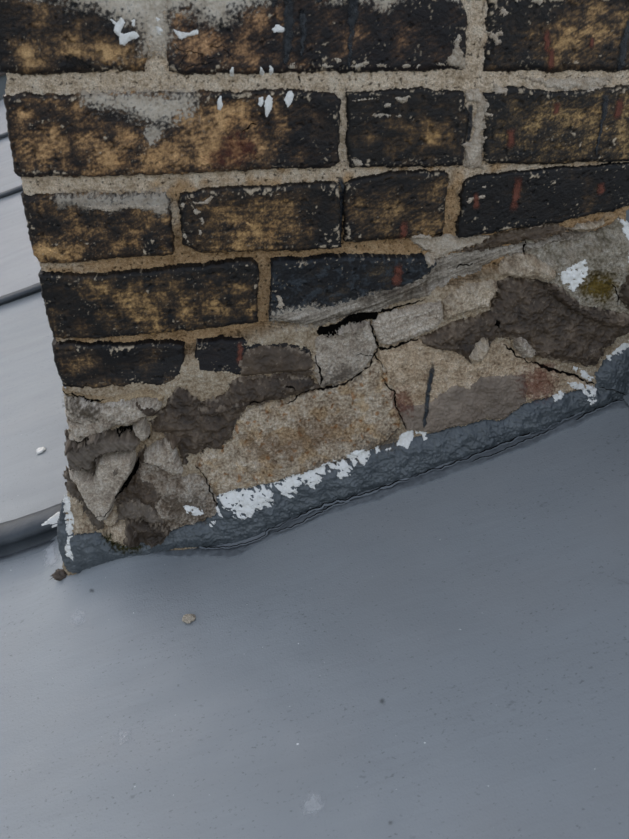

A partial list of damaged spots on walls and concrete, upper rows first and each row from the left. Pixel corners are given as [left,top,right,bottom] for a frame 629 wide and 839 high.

peeling [558,259,588,292]
crack [285,298,426,429]
peeling [606,340,629,361]
spalling [115,417,171,546]
crack [190,344,626,550]